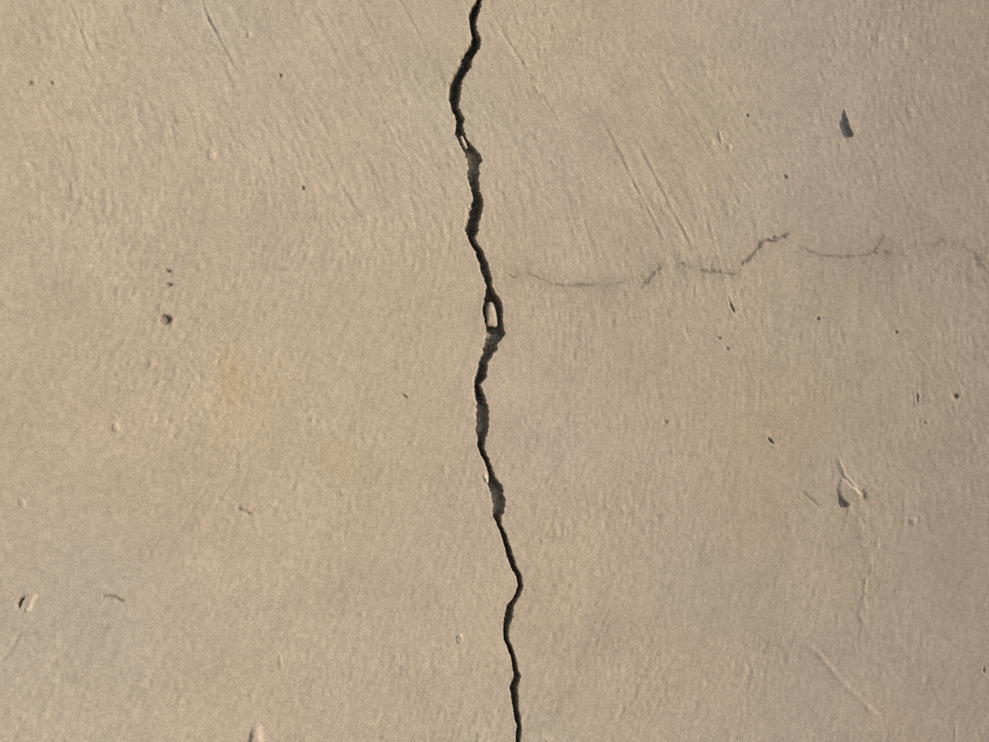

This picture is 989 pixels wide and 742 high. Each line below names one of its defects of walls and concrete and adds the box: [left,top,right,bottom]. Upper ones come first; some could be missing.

crack [444,0,525,742]